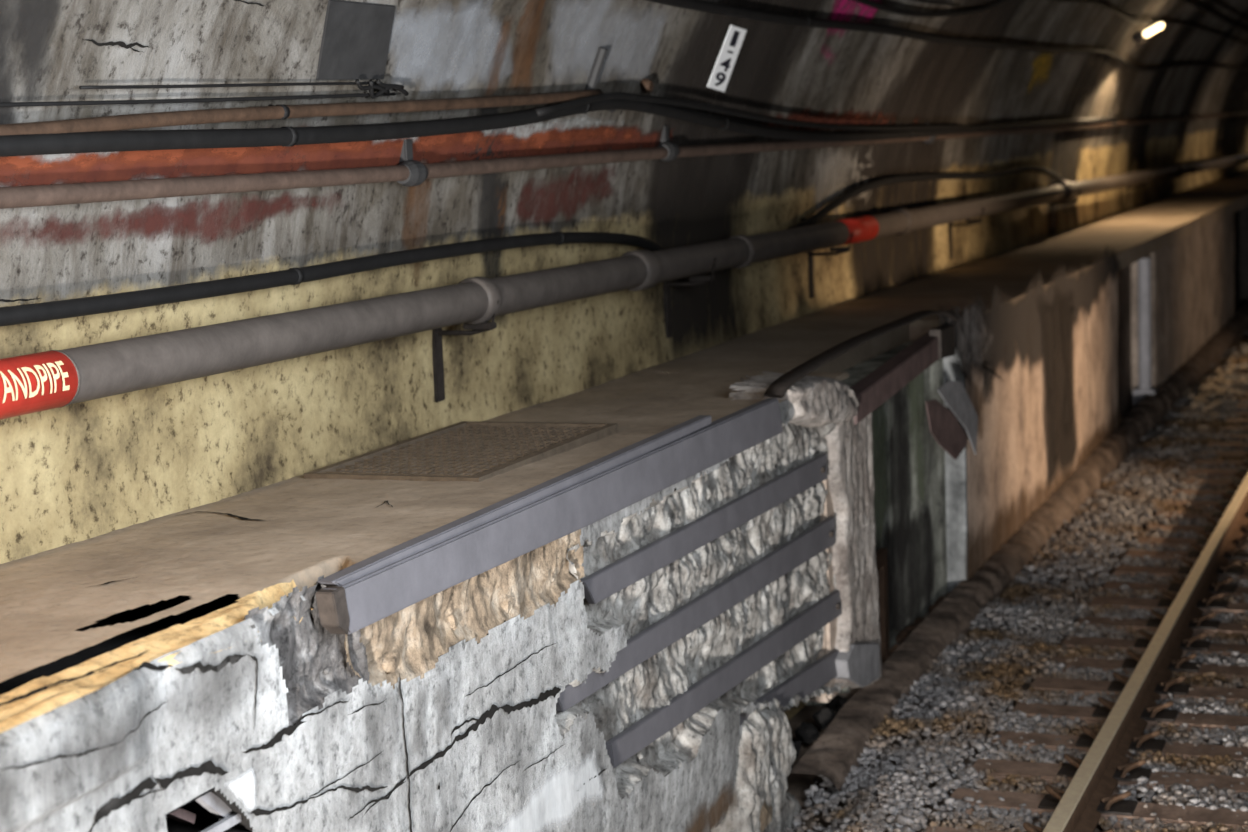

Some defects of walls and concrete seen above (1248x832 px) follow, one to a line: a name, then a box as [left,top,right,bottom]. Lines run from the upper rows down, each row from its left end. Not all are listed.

spalling [0,418,837,742]
crack [0,651,386,832]
spalling [166,787,253,832]
crack [250,643,561,820]
crack [450,744,565,832]
spalling [613,625,851,800]